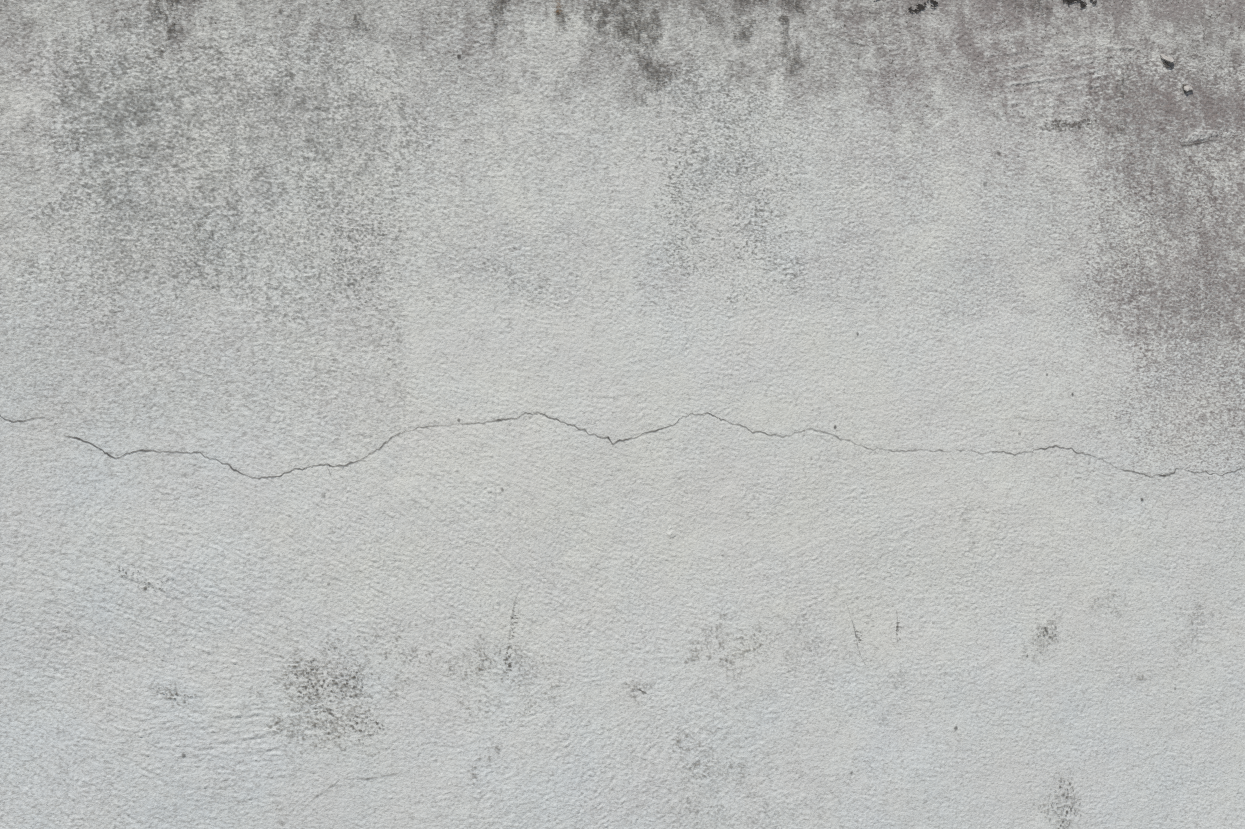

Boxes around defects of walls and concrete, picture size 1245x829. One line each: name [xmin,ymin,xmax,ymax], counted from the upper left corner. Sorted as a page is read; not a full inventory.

mould [908,0,938,13]
damp [588,0,676,101]
damp [61,54,327,240]
damp [1045,66,1245,381]
crack [69,426,428,479]
crack [465,412,775,444]
crack [1122,468,1242,477]